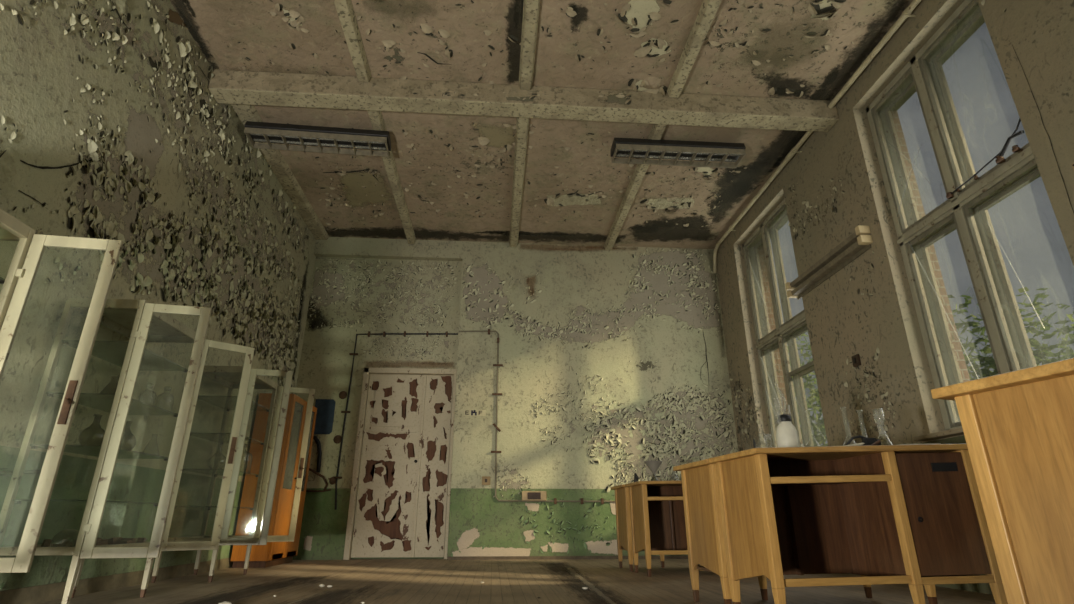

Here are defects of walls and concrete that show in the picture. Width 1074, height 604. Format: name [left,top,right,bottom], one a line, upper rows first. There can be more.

peeling [356,0,540,102]
peeling [539,0,684,105]
leakage [754,0,908,101]
crack [0,150,92,169]
peeling [0,0,310,394]
leakage [326,130,807,243]
peeling [632,165,747,227]
peeling [461,248,720,349]
peeling [358,376,452,552]
peeling [529,371,764,515]
flaking render [451,528,569,557]
flaking render [584,539,618,555]